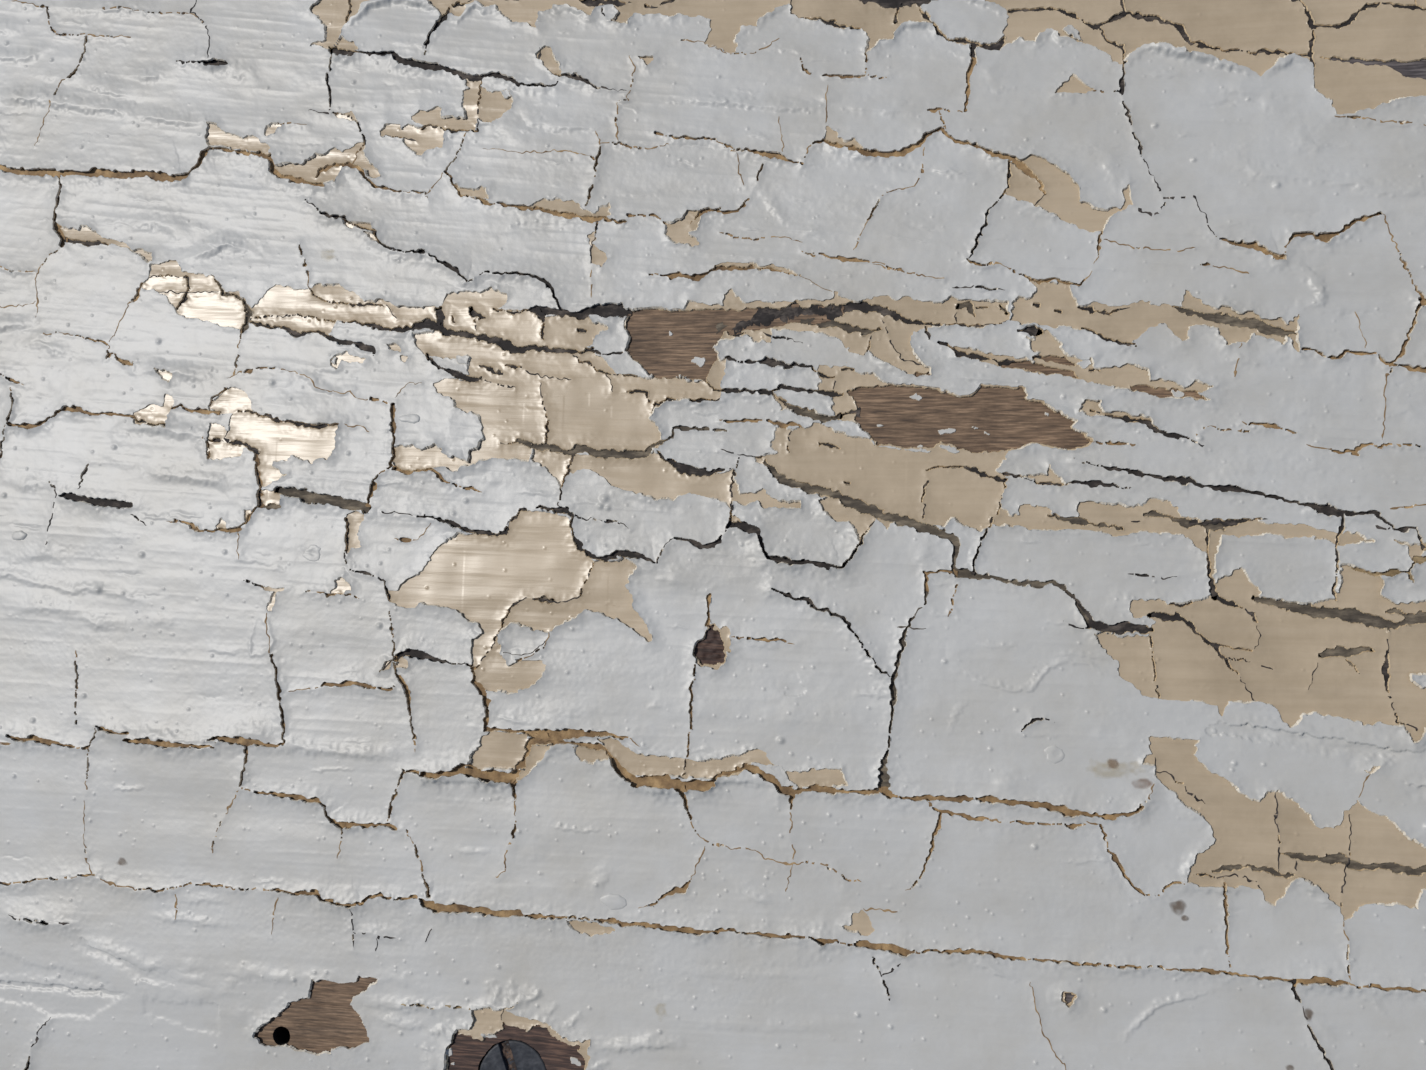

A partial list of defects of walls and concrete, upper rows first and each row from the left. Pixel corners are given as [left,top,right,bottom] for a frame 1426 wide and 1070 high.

peeling [311,0,369,53]
peeling [429,0,1426,118]
peeling [206,78,513,184]
crack [0,0,1249,366]
peeling [1002,155,1133,238]
crack [1086,29,1426,456]
peeling [61,227,1426,742]
crack [0,318,1426,1070]
peeling [570,735,847,790]
peeling [1143,736,1426,920]
peeling [254,976,377,1054]
peeling [445,1007,590,1070]